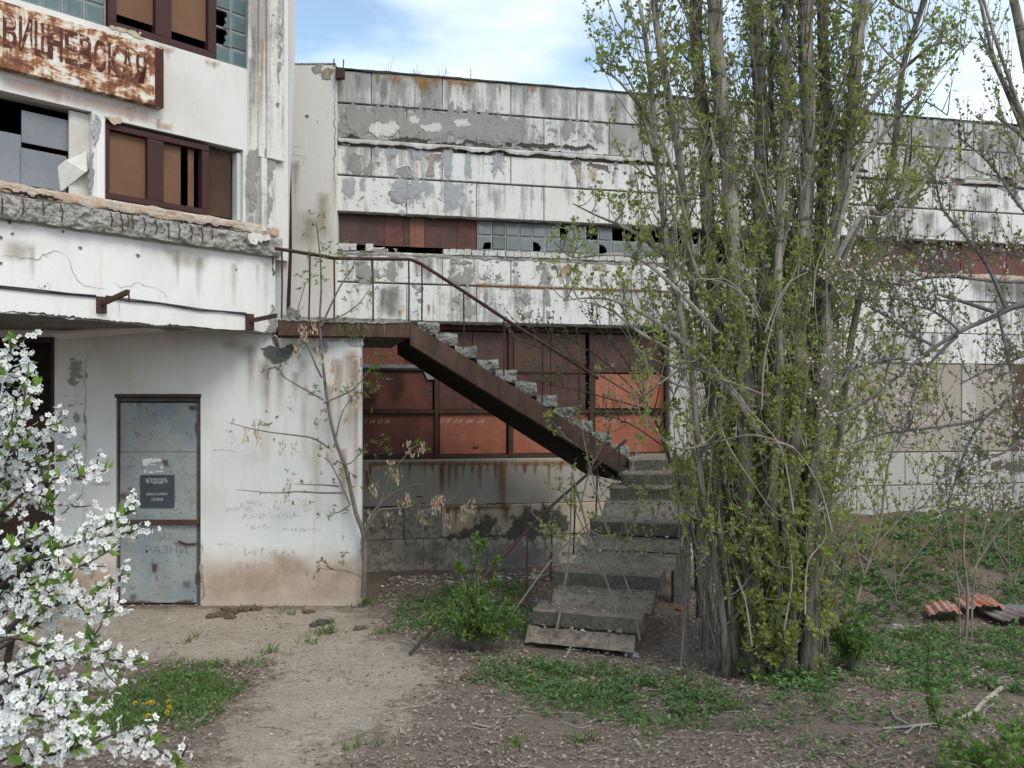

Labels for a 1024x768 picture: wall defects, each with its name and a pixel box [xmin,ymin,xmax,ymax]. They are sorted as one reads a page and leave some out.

peeling [246,148,275,223]
peeling [337,100,640,215]
spalling [110,212,213,242]
peeling [355,247,404,284]
peeling [448,258,572,319]
spalling [0,271,424,397]
peeling [60,358,88,456]
corrosion [366,461,568,521]
water stain [448,502,570,566]